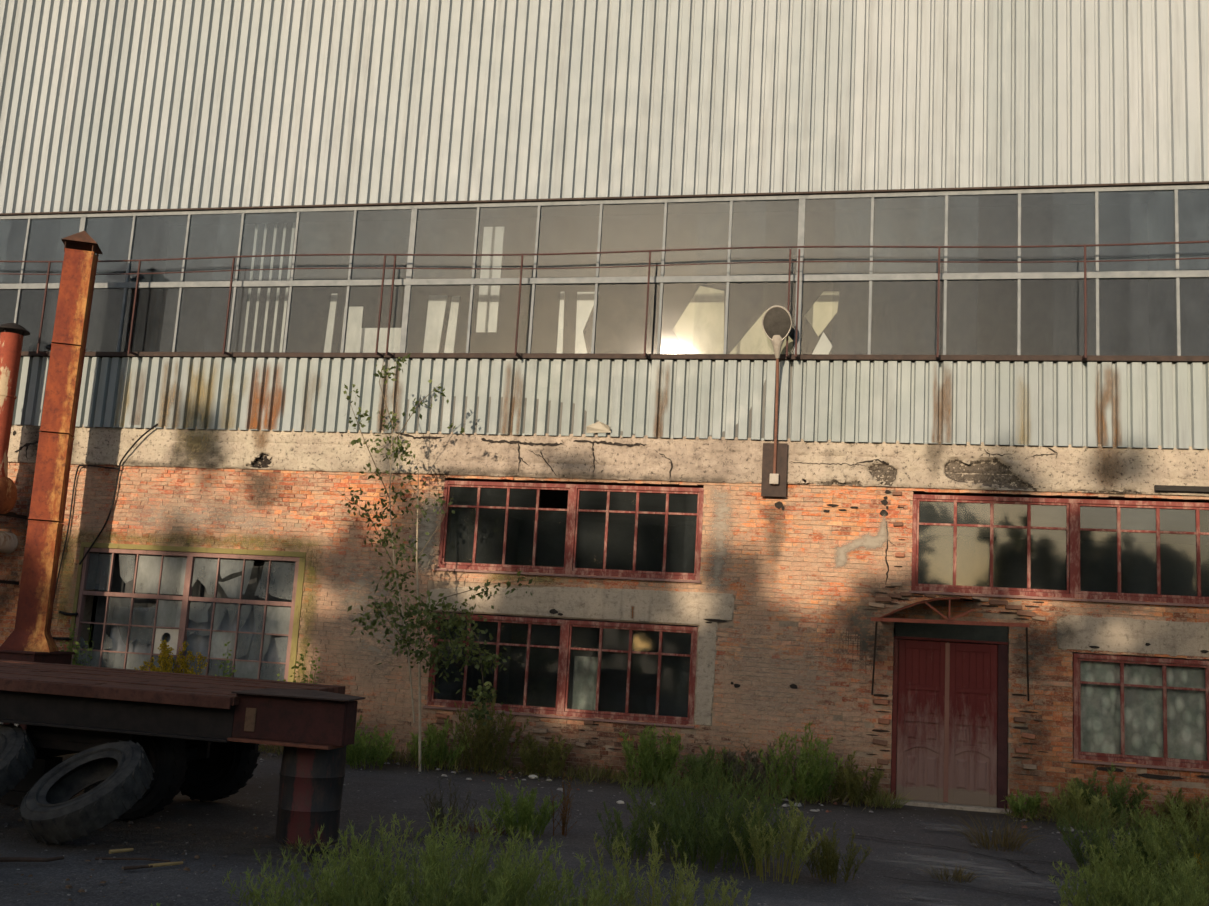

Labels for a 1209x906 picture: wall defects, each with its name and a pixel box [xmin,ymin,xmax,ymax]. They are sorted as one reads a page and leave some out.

corrosion [249,370,282,430]
corrosion [933,381,951,444]
corrosion [1096,371,1120,447]
spalling [246,452,274,468]
crack [481,438,673,477]
spalling [944,459,1043,491]
spalling [798,460,905,567]